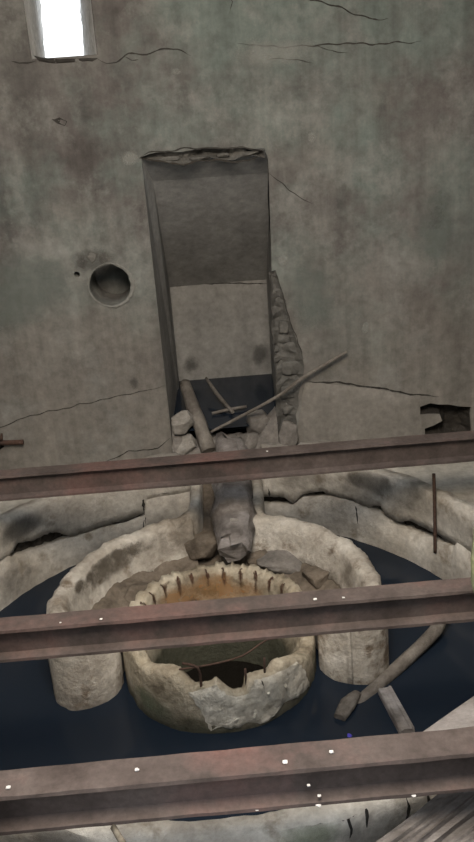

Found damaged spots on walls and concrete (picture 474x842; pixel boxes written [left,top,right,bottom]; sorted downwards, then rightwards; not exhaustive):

crack [310,0,387,20]
crack [98,48,187,64]
crack [237,41,418,63]
crack [309,381,436,397]
crack [0,386,162,428]
spalling [420,403,470,434]
spalling [179,639,310,731]